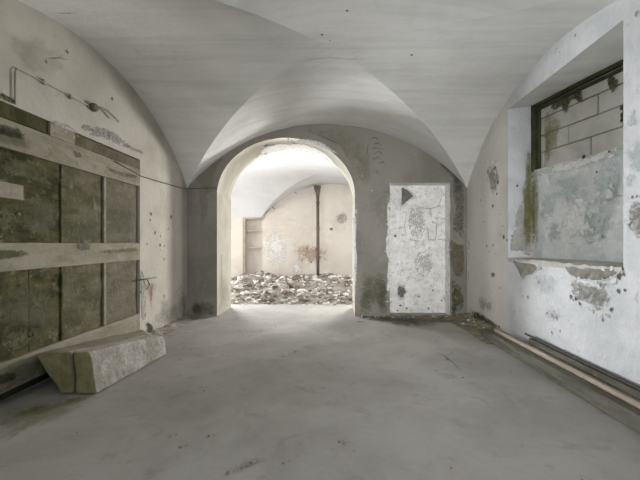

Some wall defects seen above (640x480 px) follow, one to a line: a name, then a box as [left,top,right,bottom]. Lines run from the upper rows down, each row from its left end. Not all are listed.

peeling [81,124,143,154]
flaking render [486,160,499,196]
leakage [525,164,534,237]
peeling [624,195,640,237]
flaking render [564,265,626,323]